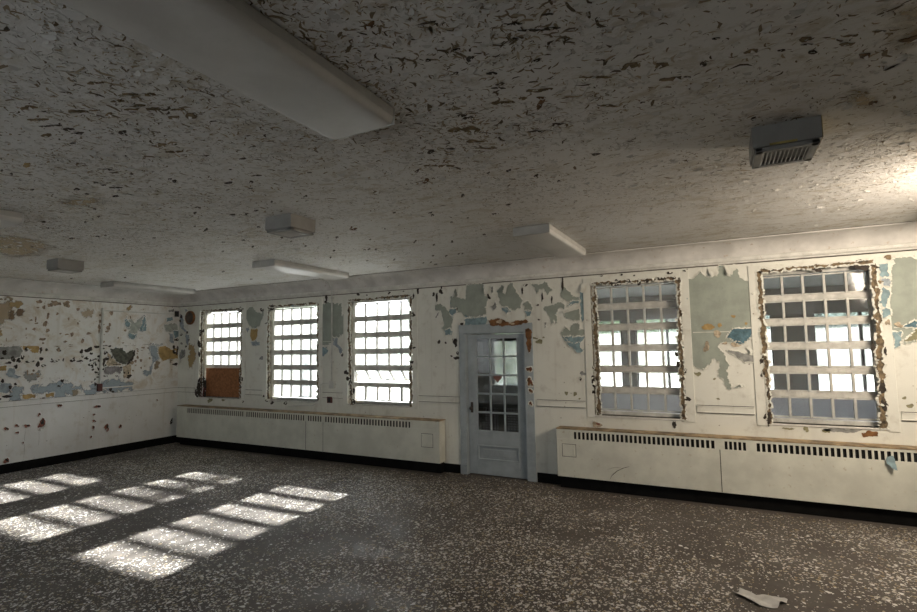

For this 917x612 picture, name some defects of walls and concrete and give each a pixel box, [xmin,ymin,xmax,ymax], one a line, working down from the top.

peeling [0,0,917,288]
peeling [0,288,419,408]
spalling [2,412,46,445]